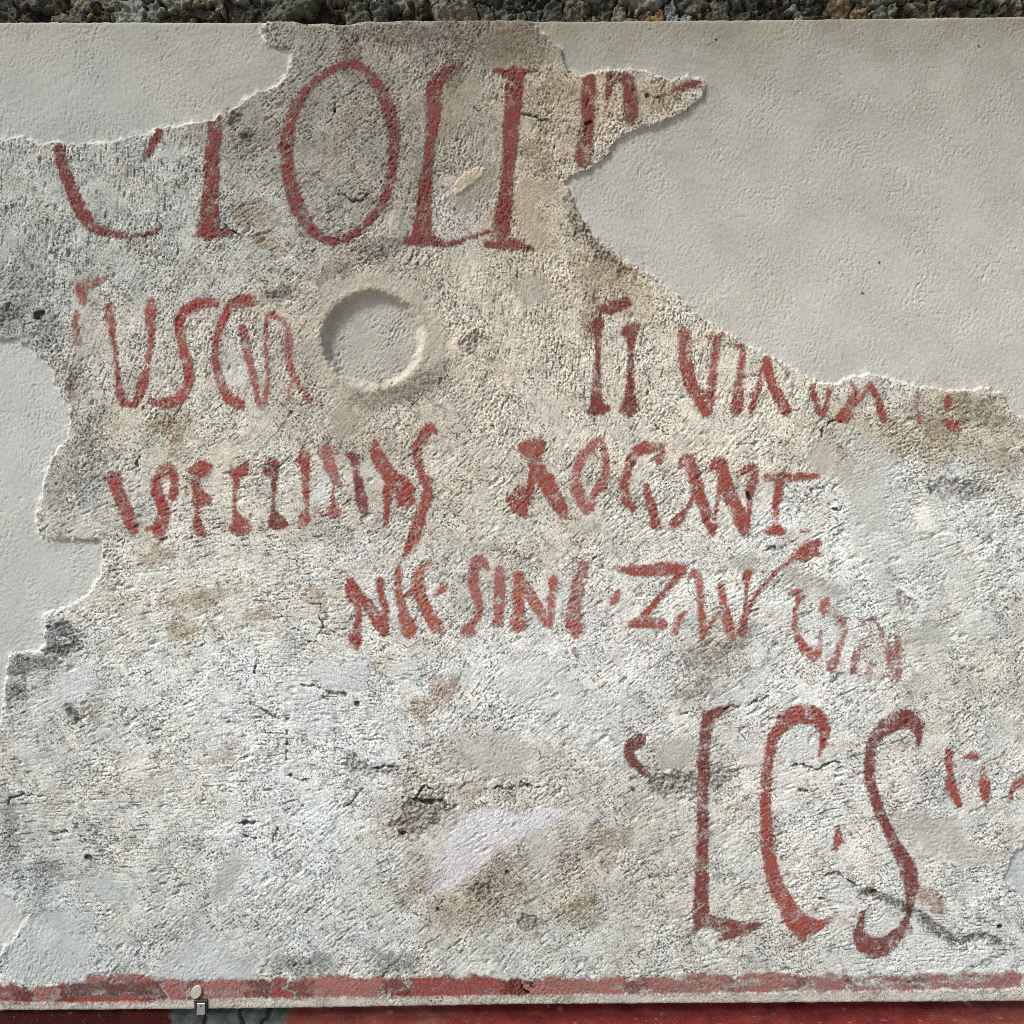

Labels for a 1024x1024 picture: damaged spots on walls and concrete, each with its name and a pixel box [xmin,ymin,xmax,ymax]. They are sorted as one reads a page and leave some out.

spalling [45,621,81,658]